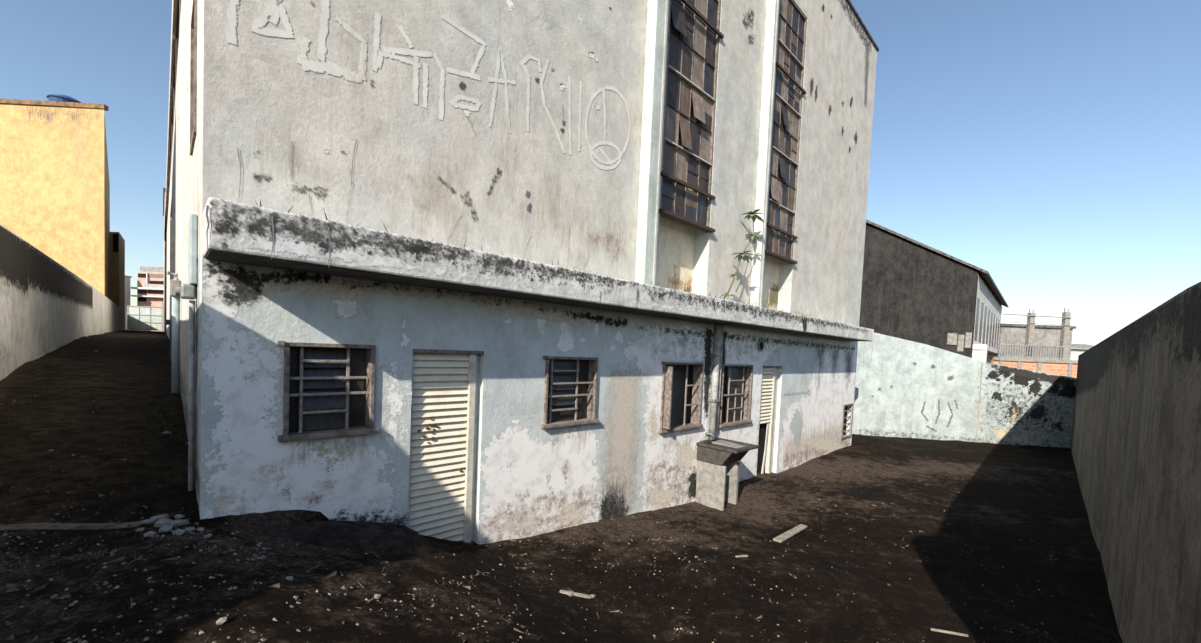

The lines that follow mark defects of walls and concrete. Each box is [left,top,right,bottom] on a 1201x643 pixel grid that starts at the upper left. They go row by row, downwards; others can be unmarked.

leakage [0,226,93,309]
peeling [182,259,412,524]
leakage [180,199,868,512]
peeling [478,420,604,544]
peeling [246,230,857,512]
leakage [599,482,629,522]
corrosion [669,267,692,293]
leakage [841,285,1201,529]